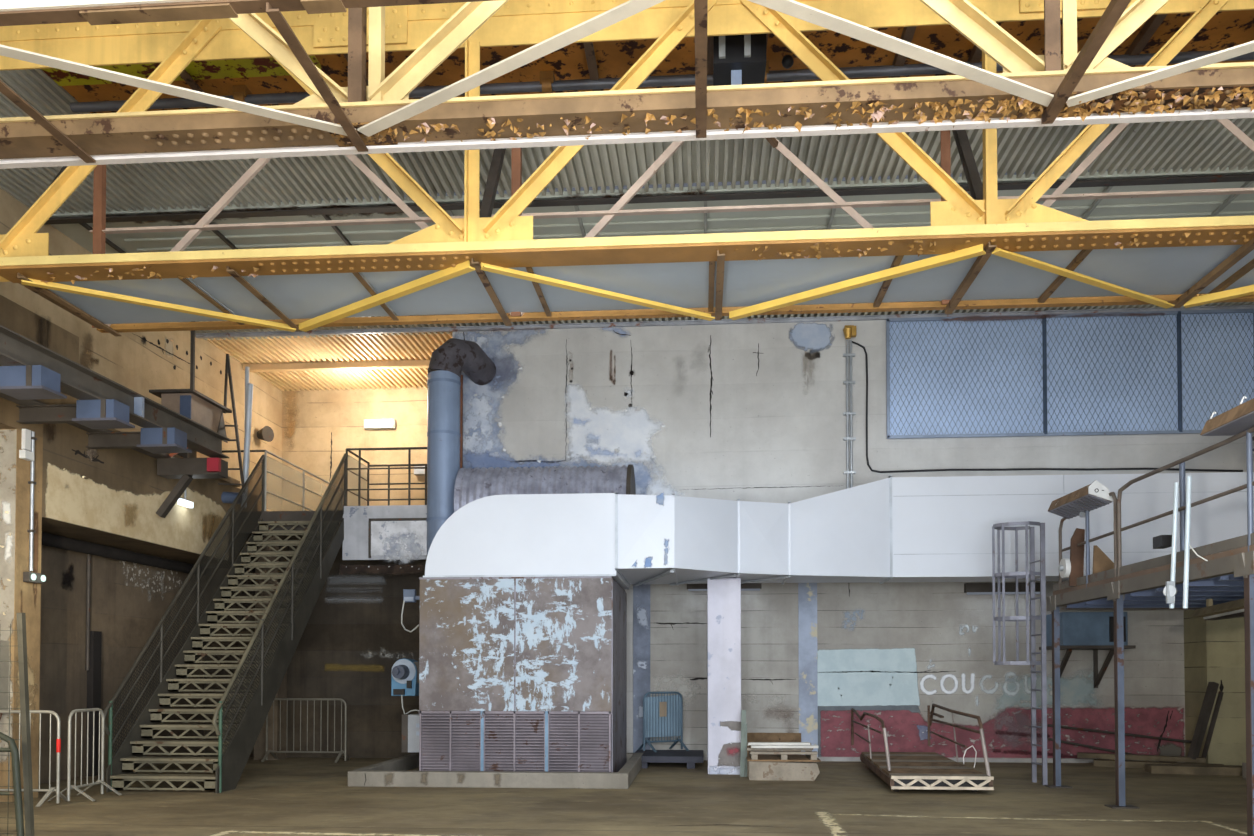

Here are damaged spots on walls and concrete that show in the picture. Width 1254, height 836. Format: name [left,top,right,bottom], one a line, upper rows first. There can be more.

peeling [455,329,677,505]
crack [707,335,715,437]